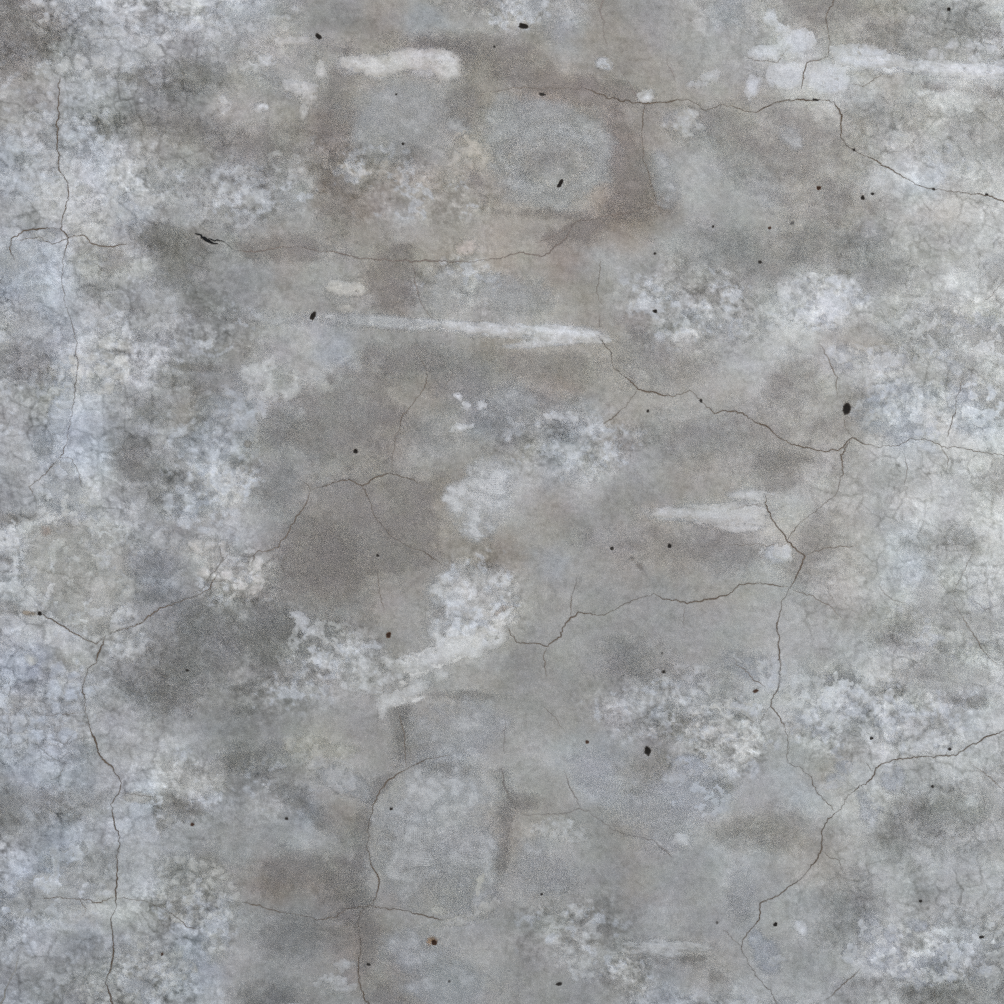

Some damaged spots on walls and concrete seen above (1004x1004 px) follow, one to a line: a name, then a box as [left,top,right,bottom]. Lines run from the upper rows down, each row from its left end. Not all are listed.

peeling [172,0,322,80]
peeling [282,60,327,121]
spalling [338,47,464,81]
water stain [487,73,678,240]
crack [193,0,1004,317]
water stain [596,58,613,70]
peeling [744,8,1004,102]
crack [2,81,126,499]
spalling [426,321,612,348]
crack [42,351,453,1004]
peeling [287,567,515,720]
crack [502,262,1004,1004]